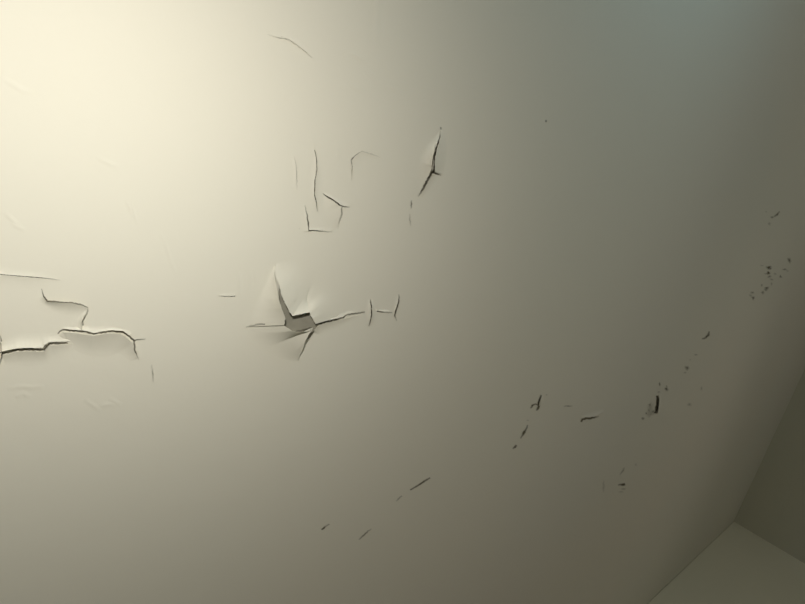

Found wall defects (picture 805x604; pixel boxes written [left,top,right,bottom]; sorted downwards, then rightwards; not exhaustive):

crack [0,266,61,288]
peeling [0,292,144,366]
peeling [245,259,351,362]